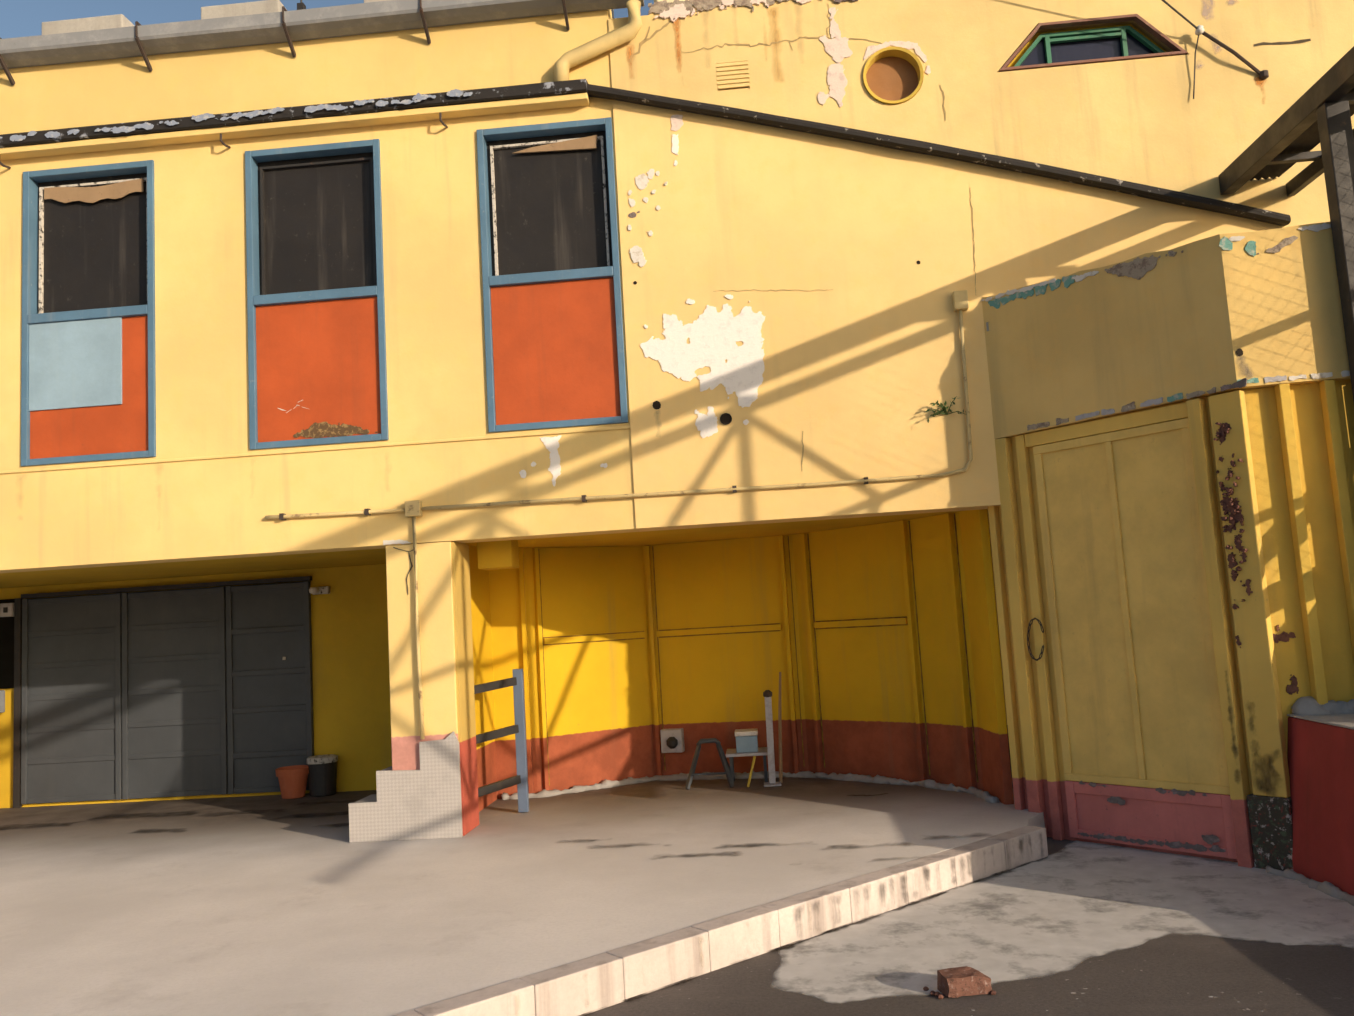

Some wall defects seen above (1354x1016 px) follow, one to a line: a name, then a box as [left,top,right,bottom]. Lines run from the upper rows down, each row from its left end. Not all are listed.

spalling [648,0,812,22]
peeling [818,0,931,107]
peeling [0,107,285,141]
peeling [304,89,473,113]
peeling [671,114,684,166]
peeling [628,169,667,285]
peeling [1219,223,1331,257]
peeling [980,250,1183,309]
peeling [640,294,765,438]
peeling [519,435,561,486]
peeling [1213,422,1253,610]
peeling [1273,625,1296,643]